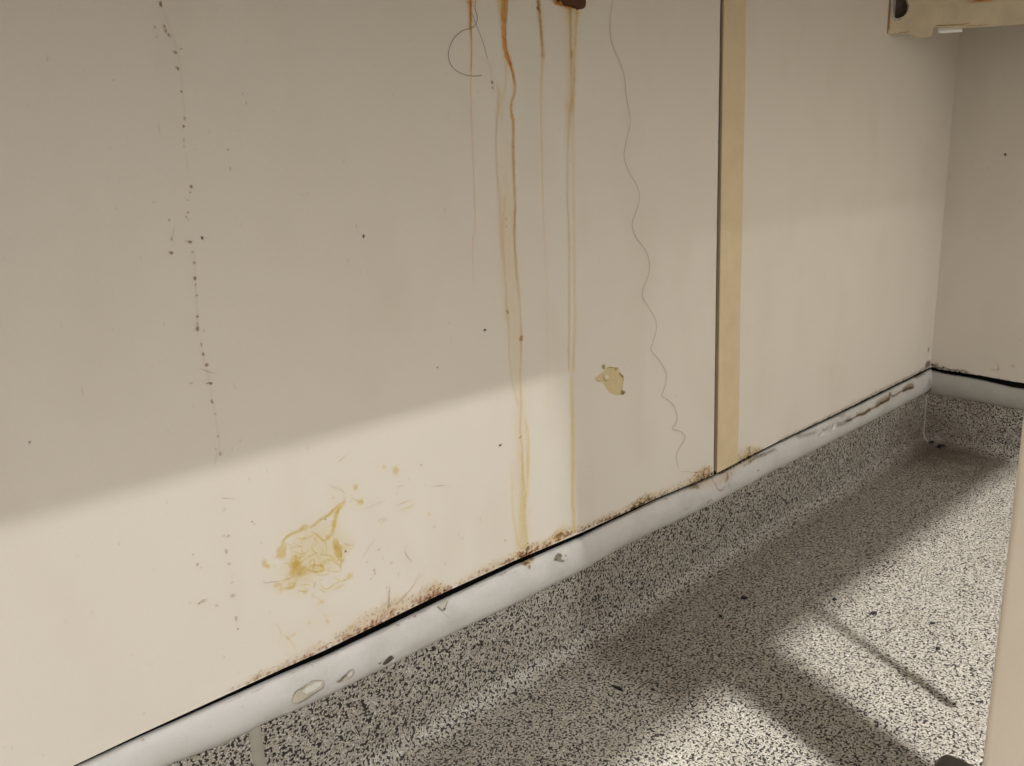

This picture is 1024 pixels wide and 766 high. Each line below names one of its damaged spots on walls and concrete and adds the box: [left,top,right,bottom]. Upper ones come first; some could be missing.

peeling [291,680,324,704]